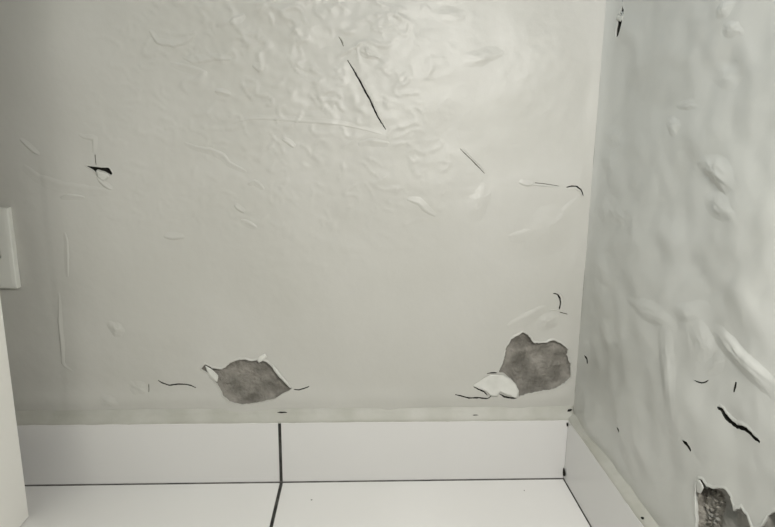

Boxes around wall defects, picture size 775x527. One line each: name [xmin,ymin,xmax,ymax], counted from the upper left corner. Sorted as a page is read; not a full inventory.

crack [339,37,386,130]
crack [462,148,485,174]
spalling [199,354,309,406]
spalling [455,331,573,399]
crack [718,404,760,443]
spalling [694,476,775,527]